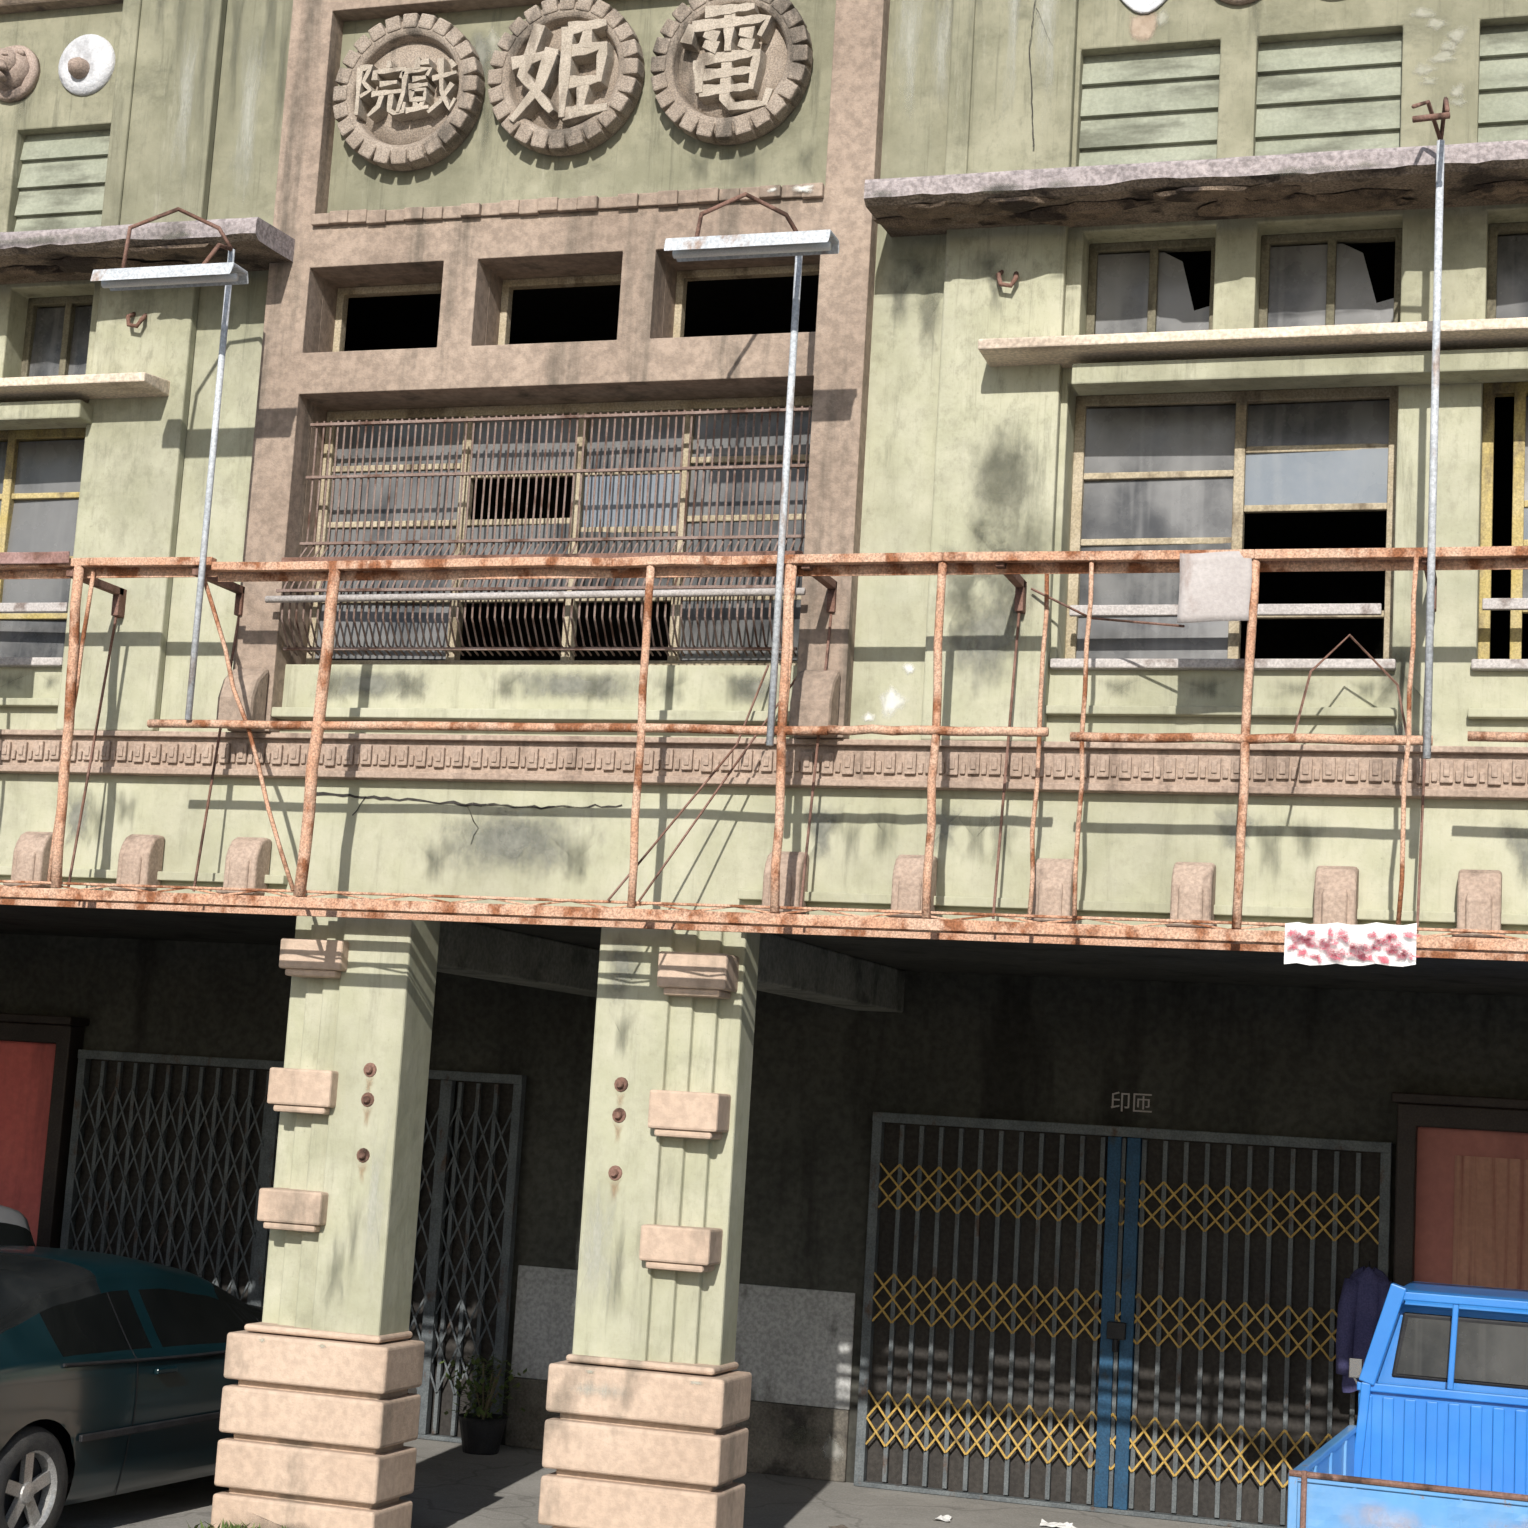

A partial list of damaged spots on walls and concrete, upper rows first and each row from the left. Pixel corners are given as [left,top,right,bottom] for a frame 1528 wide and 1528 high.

crack [1029,1,1053,146]
spalling [874,169,1417,230]
spalling [0,233,236,283]
damp [985,448,1021,503]
damp [954,577,1016,669]
crack [316,792,622,844]
damp [463,821,564,864]